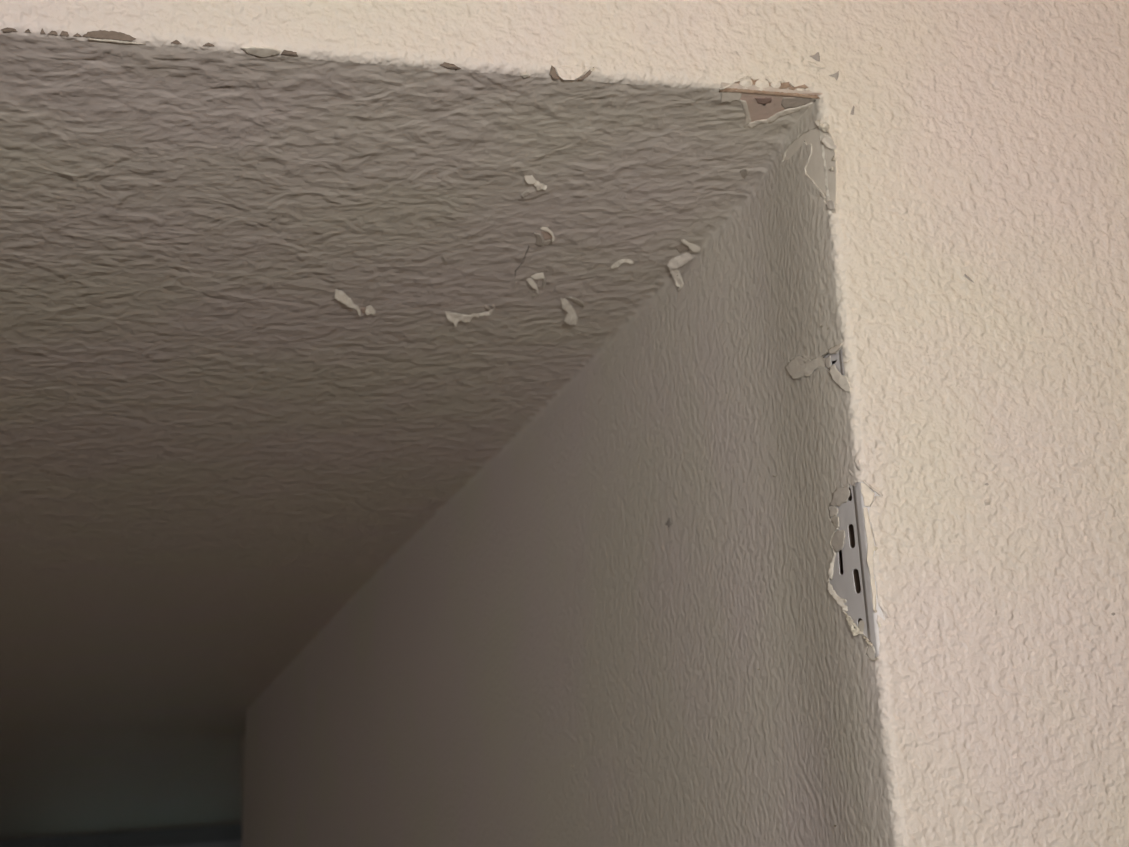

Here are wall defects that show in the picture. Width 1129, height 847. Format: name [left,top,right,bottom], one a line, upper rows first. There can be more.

flaking render [719,76,822,128]
peeling [784,120,837,213]
peeling [527,272,546,299]
peeling [611,259,634,269]
peeling [667,239,700,291]
peeling [445,305,495,327]
peeling [560,297,586,326]
peeling [785,342,851,392]
peeling [827,480,890,661]